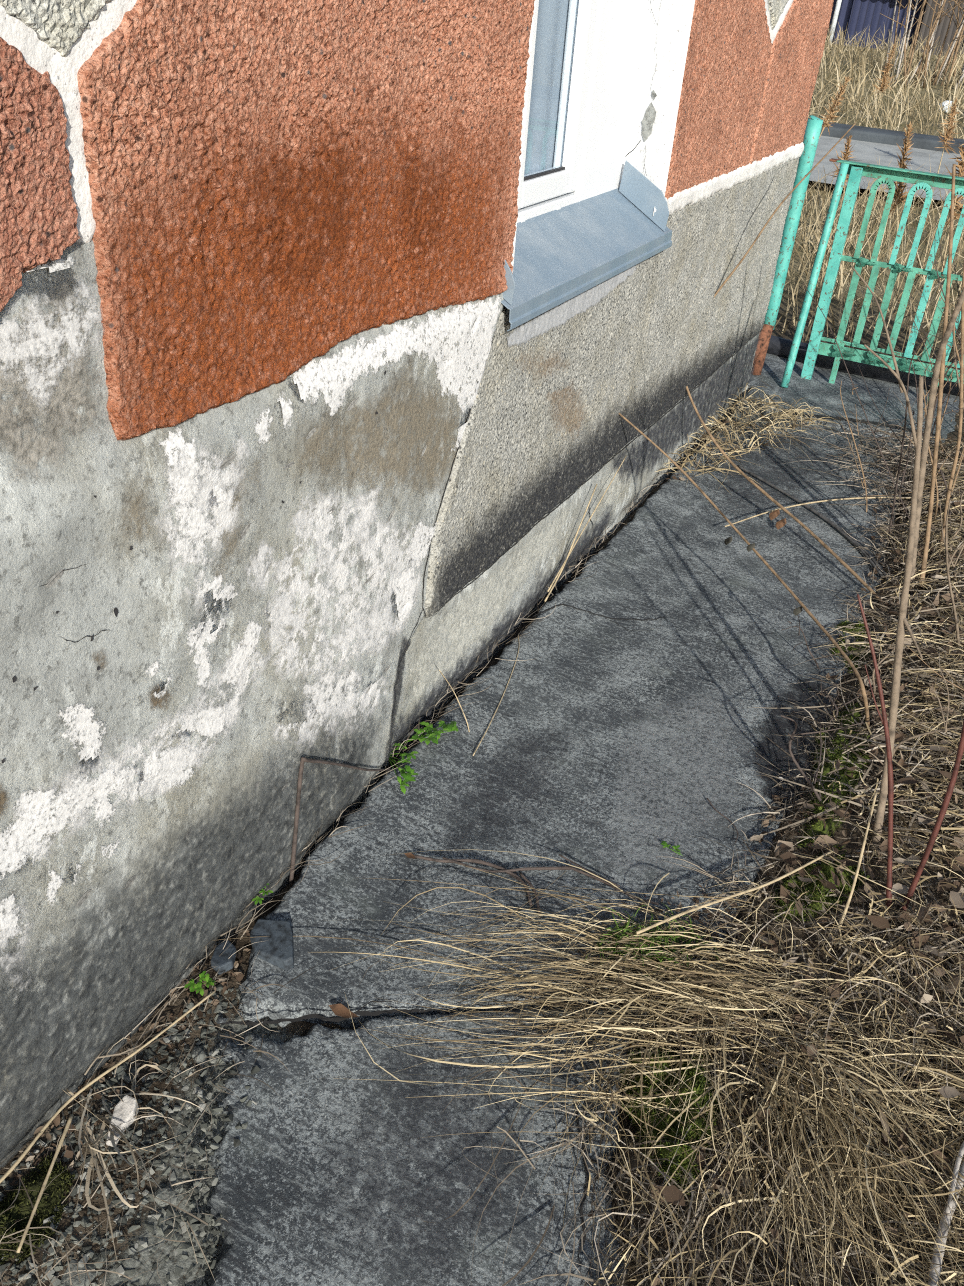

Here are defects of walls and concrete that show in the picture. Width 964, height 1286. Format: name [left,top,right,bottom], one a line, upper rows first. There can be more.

flaking render [0,257,102,474]
peeling [159,294,503,556]
peeling [303,521,437,731]
water stain [0,324,763,1169]
water stain [755,679,841,815]
crack [218,1000,445,1026]
water stain [347,1096,507,1244]